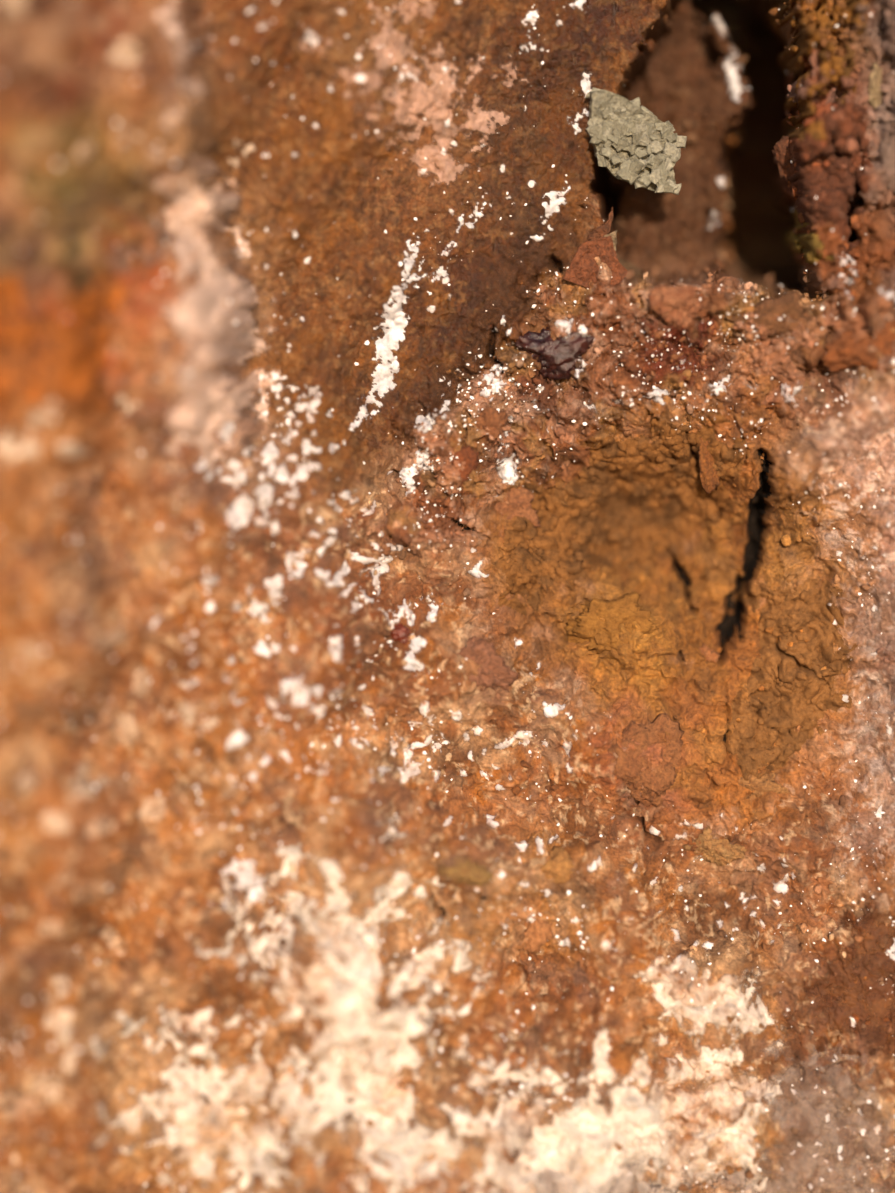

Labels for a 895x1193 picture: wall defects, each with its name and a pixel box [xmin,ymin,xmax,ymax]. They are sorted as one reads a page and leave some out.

water stain [194,193,492,540]
efflorescence [475,357,517,401]
efflorescence [494,414,519,497]
water stain [231,490,443,677]
crack [667,548,694,610]
crack [716,449,772,659]
efflorescence [256,670,378,758]
efflorescence [369,701,450,784]
efflorescence [450,710,577,791]
efflorescence [542,701,570,718]
efflorescence [514,834,559,863]
efflorescence [0,840,802,1193]